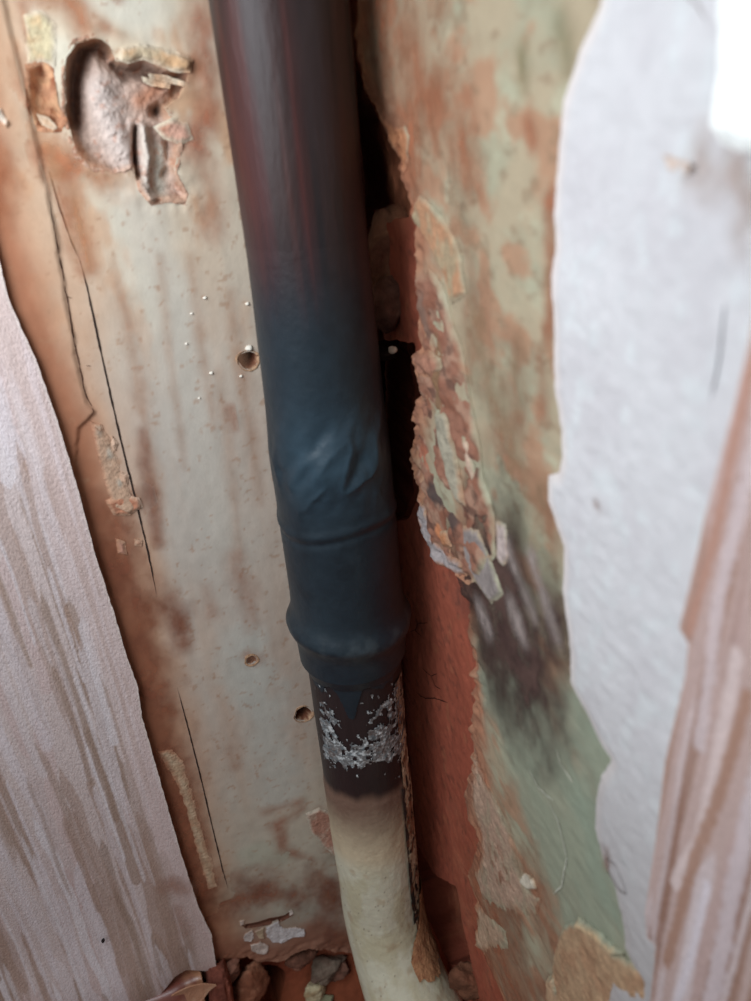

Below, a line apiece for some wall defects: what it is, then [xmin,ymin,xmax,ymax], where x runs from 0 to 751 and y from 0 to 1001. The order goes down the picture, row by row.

corrosion [63,0,87,30]
corrosion [366,0,401,61]
spalling [22,10,194,206]
crack [48,169,156,590]
spalling [409,194,511,604]
corrosion [103,509,175,752]
leakage [508,602,525,643]
peeling [157,749,217,890]
corrosion [168,783,216,901]
crack [178,692,228,887]
peeling [545,916,645,1001]